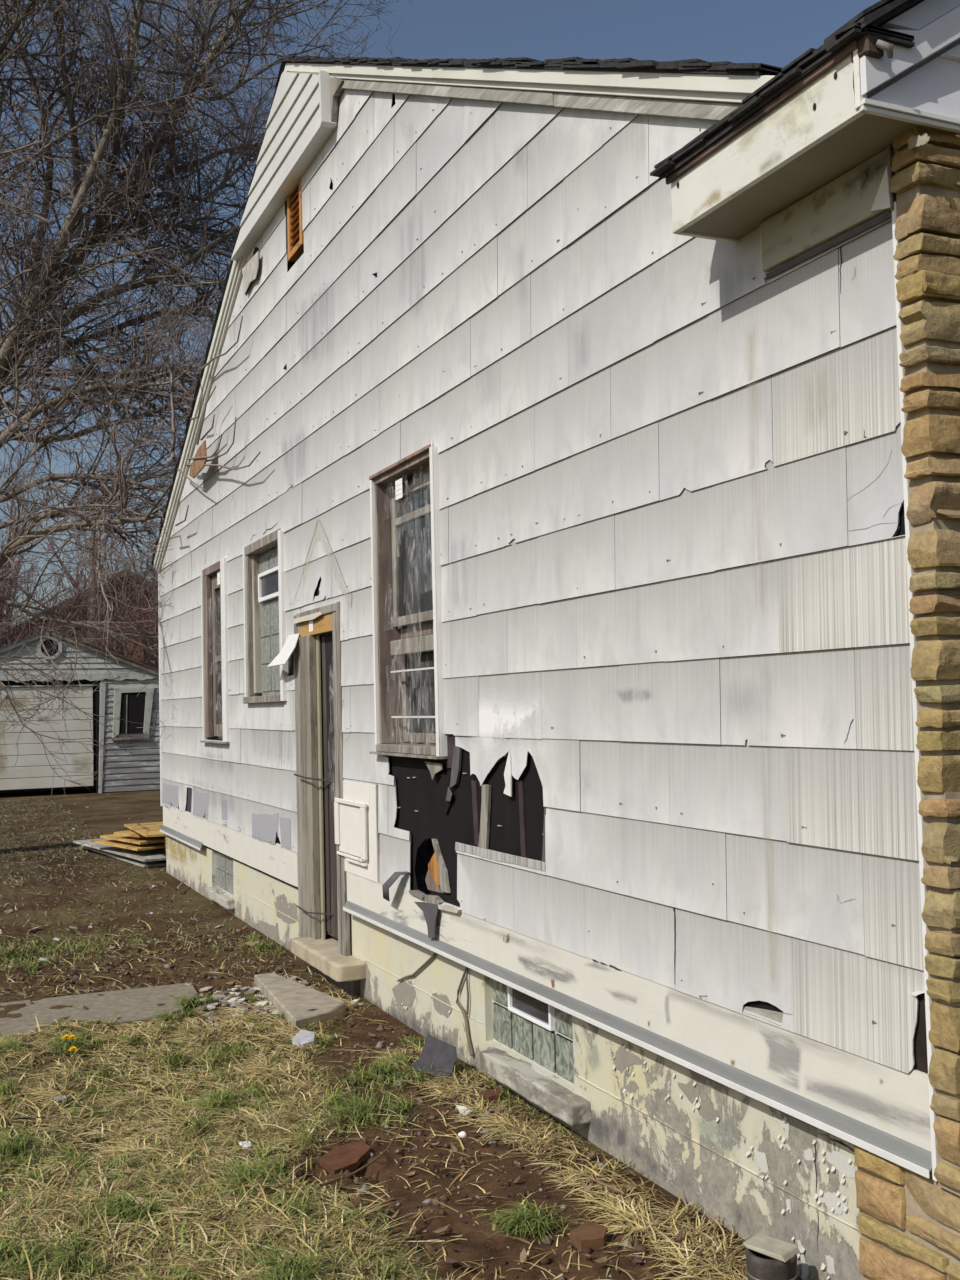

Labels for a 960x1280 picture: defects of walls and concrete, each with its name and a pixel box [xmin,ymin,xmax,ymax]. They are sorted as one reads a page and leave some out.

crack [847,431,900,531]
peeling [519,957,573,981]
peeling [392,981,452,1018]
spalling [744,1001,783,1023]
spalling [911,991,928,1074]
peeling [613,1040,649,1098]
peeling [664,1073,719,1122]
peeling [745,1115,789,1179]
peeling [797,1139,855,1215]
peeling [791,1237,836,1280]